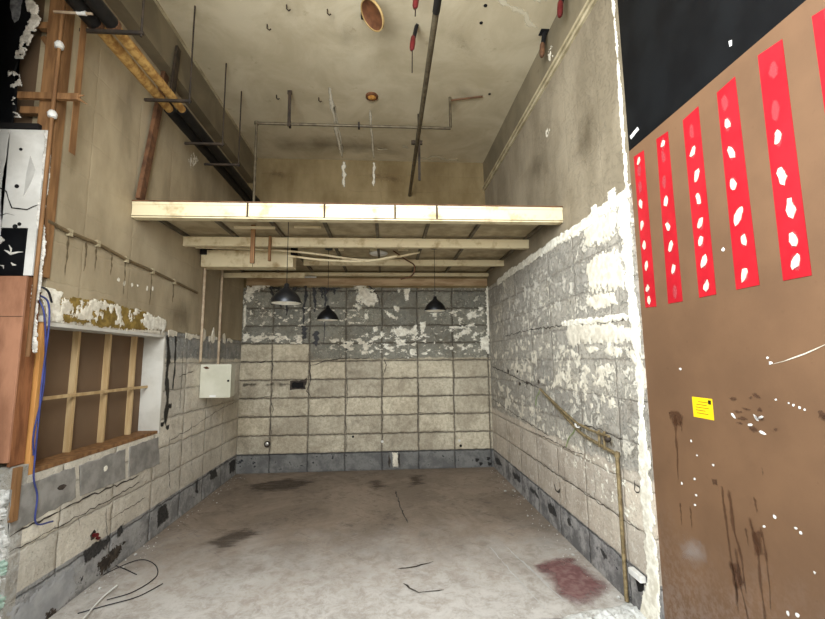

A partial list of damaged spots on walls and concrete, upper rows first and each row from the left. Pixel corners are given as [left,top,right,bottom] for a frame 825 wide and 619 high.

crack [0,188,37,216]
water stain [270,286,340,325]
peeling [243,0,661,619]
flaking render [168,327,233,344]
peeling [0,437,160,619]